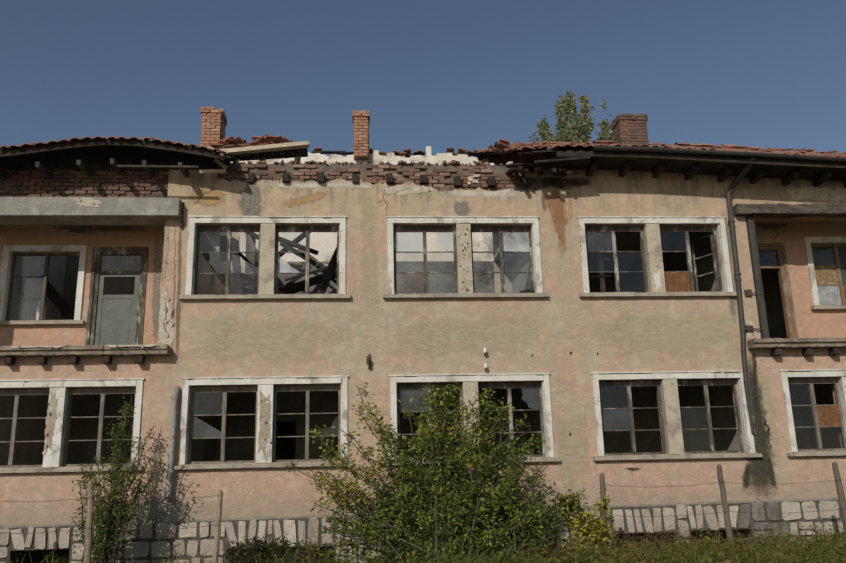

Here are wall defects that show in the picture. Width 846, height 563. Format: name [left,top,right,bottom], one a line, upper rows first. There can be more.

water stain [752,355,780,486]